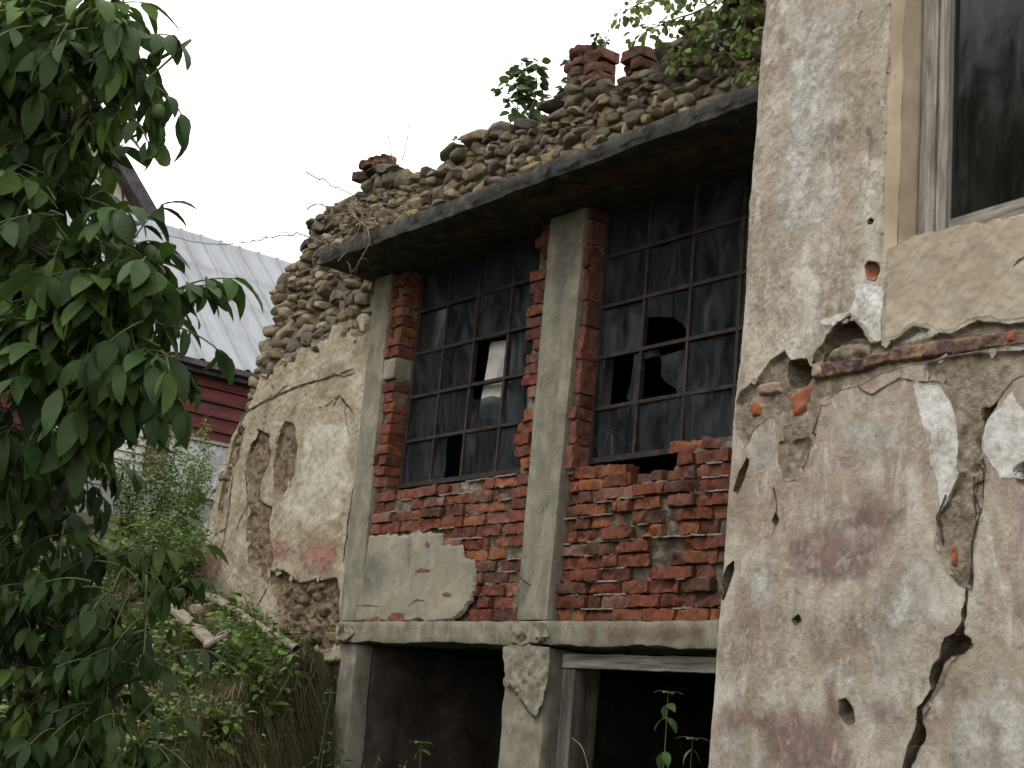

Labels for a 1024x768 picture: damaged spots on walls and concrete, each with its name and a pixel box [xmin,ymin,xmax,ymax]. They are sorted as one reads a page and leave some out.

crack [209,368,355,581]
peeling [210,420,354,659]
spalling [367,611,406,622]
spalling [503,621,550,720]
spalling [735,261,1024,589]
rust [820,330,1024,380]
crack [902,469,989,768]